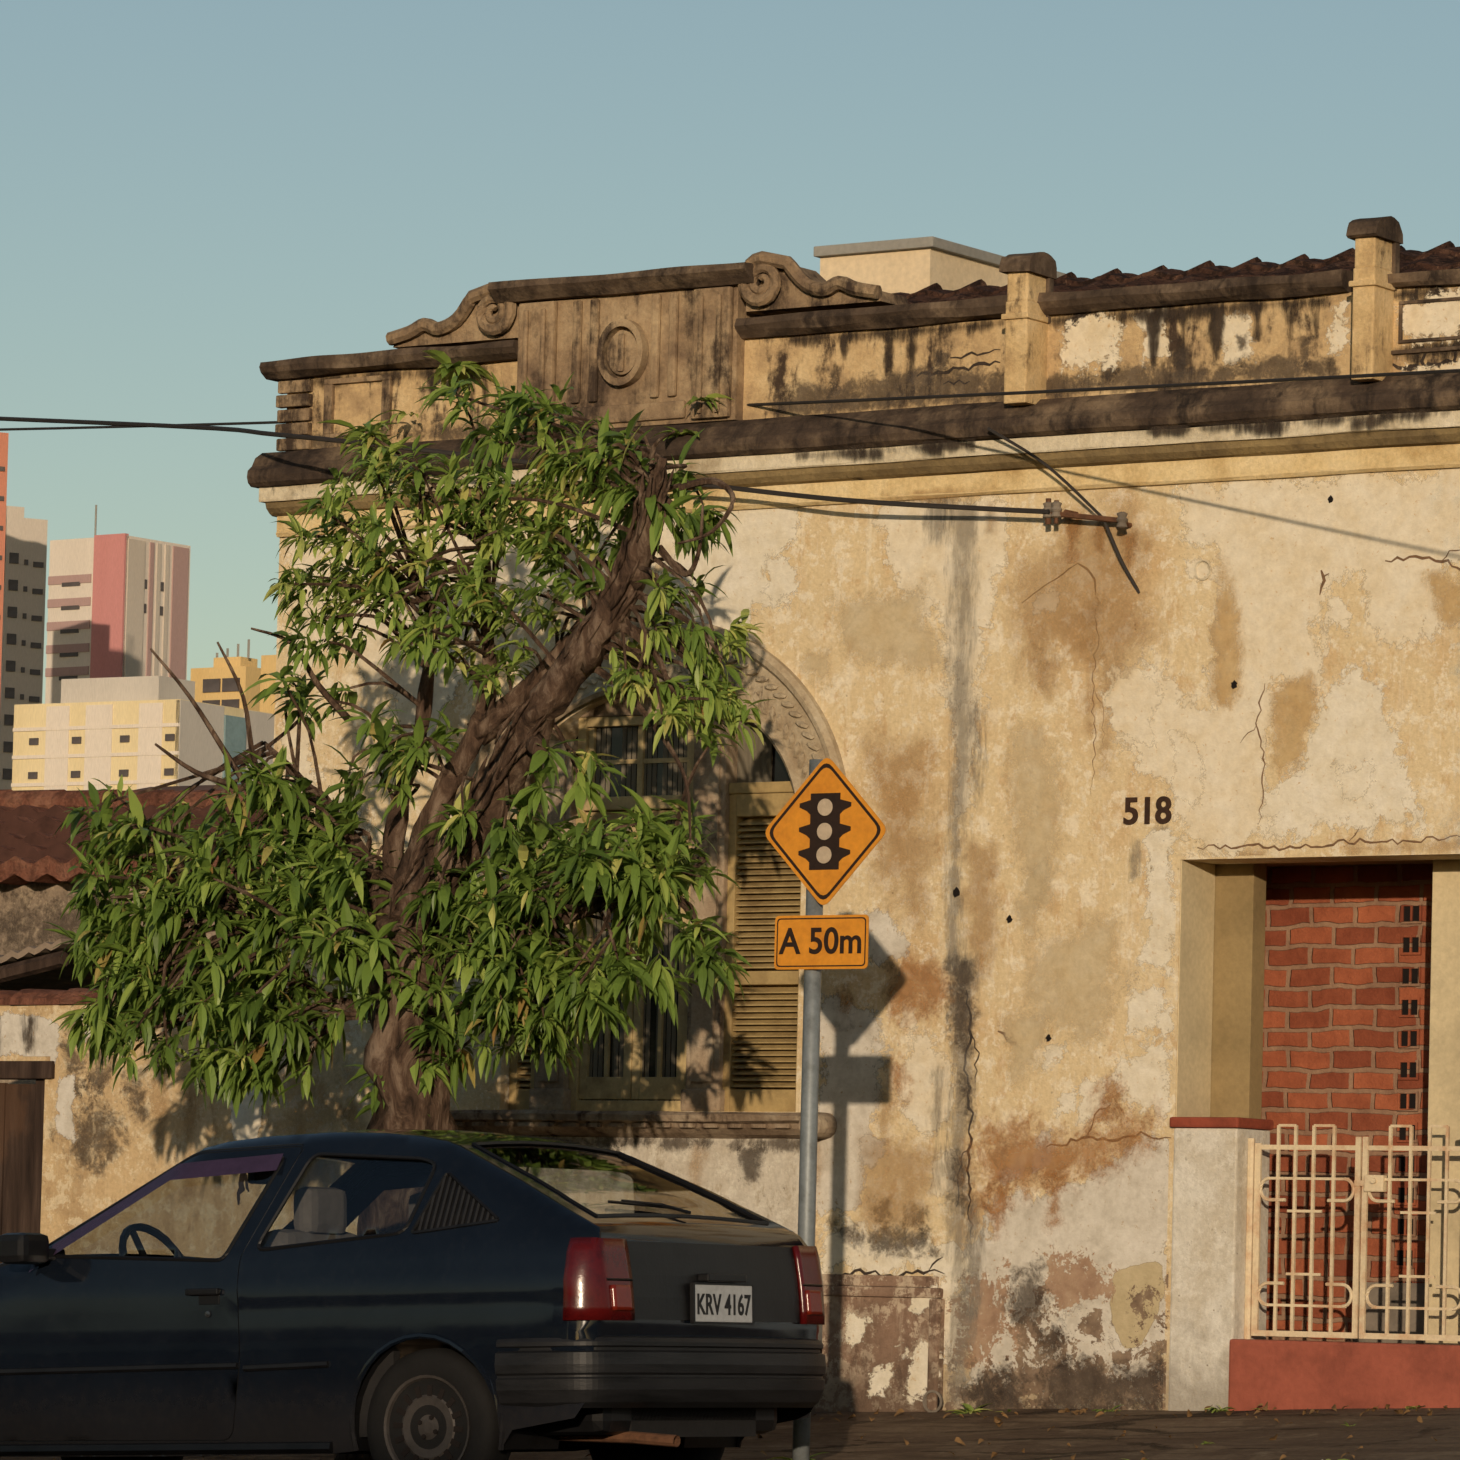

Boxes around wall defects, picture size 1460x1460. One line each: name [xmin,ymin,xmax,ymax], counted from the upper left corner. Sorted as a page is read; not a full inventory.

damp [1046,298,1338,398]
peeling [1393,286,1460,372]
crack [1385,550,1460,571]
crack [1197,684,1460,851]
peeling [815,468,1460,1411]
damp [949,956,976,1056]
peeling [0,1010,77,1144]